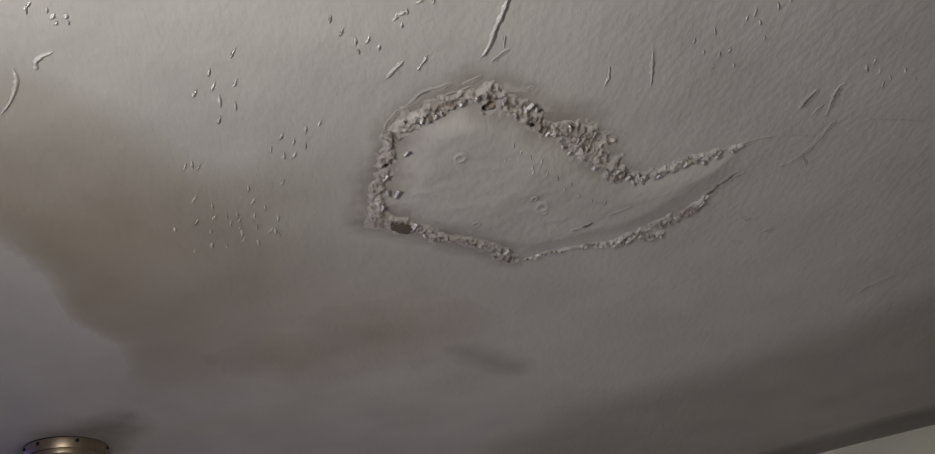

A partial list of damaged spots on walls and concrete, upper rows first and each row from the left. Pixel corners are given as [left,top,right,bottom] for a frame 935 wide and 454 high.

crack [523,83,928,261]